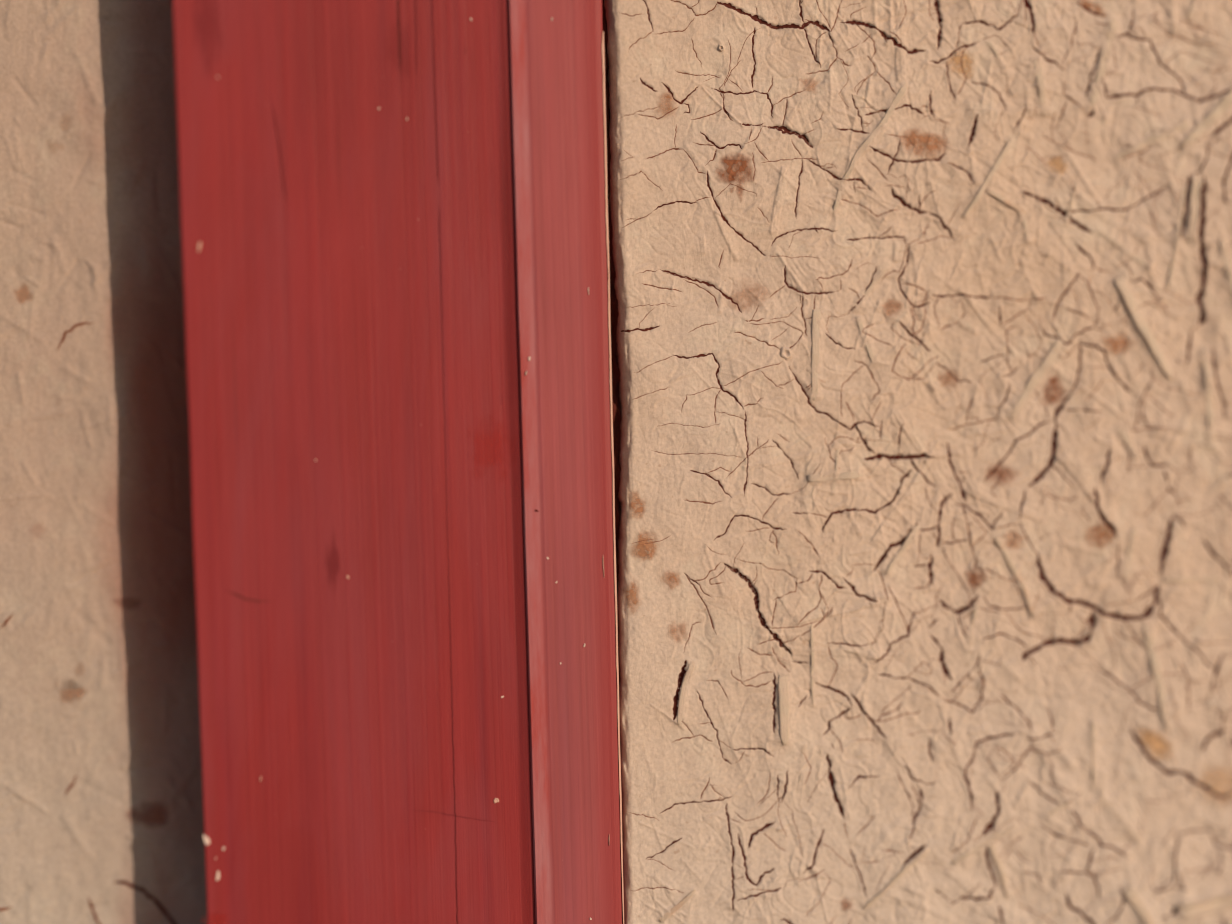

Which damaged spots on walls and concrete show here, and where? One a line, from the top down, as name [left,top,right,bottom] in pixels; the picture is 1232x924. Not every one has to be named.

crack [602,0,1232,924]